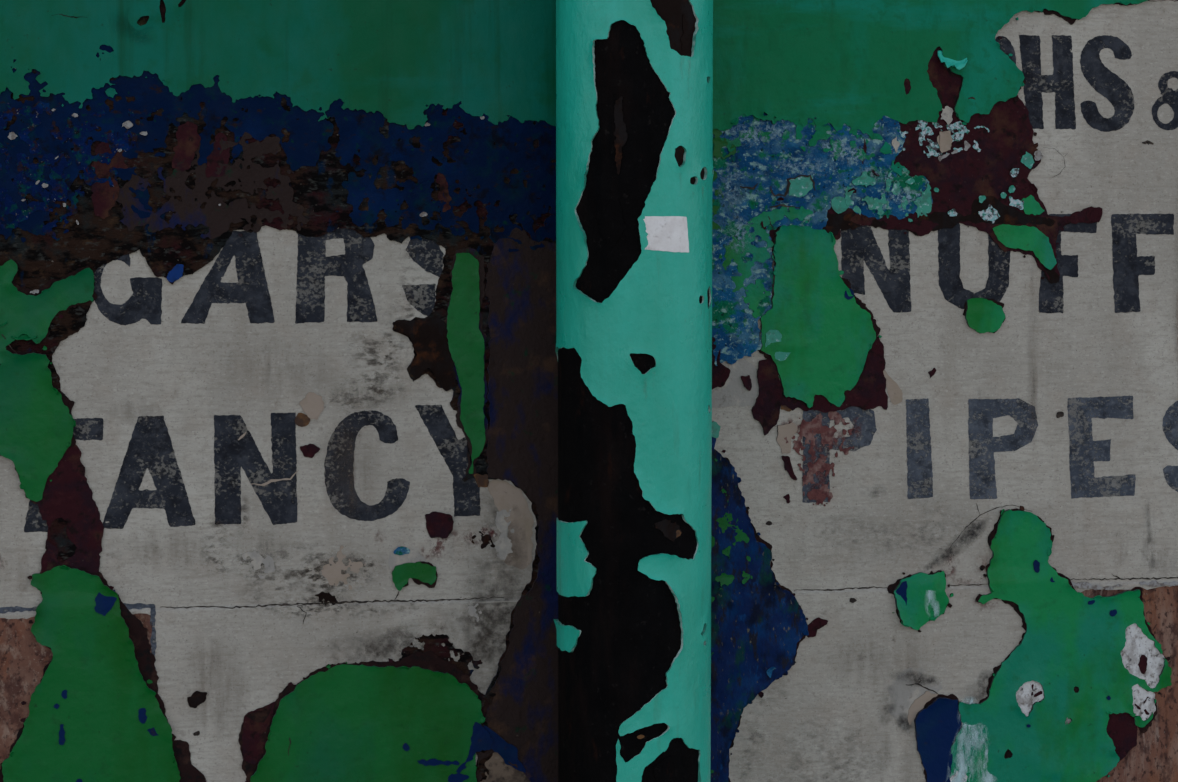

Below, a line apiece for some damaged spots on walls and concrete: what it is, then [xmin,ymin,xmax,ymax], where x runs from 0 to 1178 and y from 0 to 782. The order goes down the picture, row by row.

peeling [0,0,699,782]
peeling [690,0,1172,782]